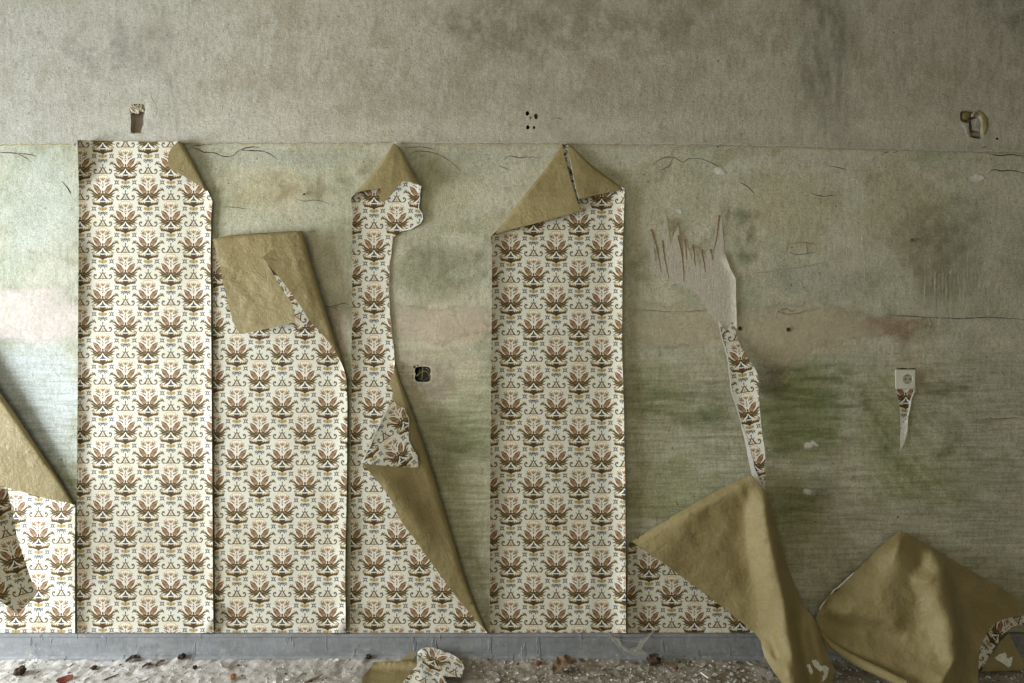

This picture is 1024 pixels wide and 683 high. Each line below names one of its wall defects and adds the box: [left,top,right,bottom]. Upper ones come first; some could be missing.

peeling [362,364,487,632]
peeling [807,660,829,681]
peeling [995,653,1013,667]